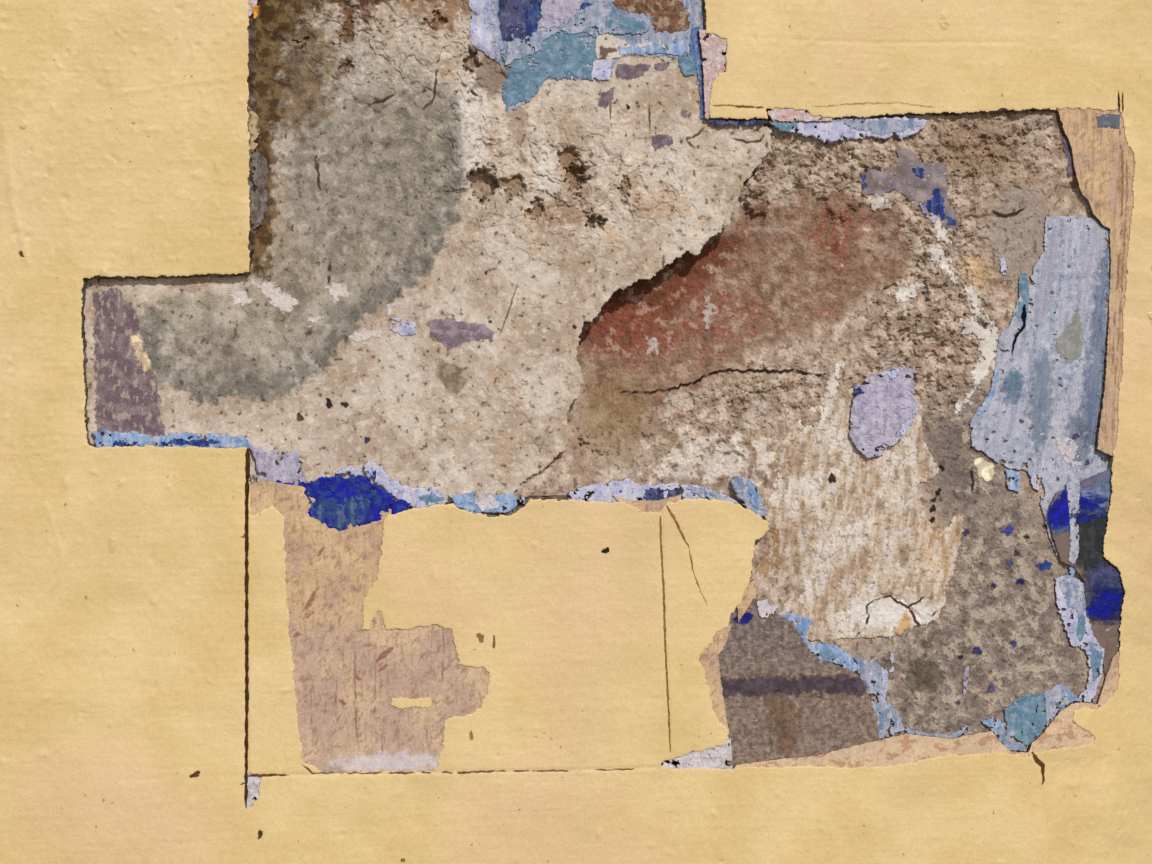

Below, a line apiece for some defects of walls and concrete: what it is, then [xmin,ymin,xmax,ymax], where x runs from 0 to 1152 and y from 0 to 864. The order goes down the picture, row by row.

peeling [1095,114,1121,129]
peeling [390,320,417,336]
peeling [130,333,152,372]
crack [621,368,827,393]
spalling [751,536,774,569]
crack [660,505,706,751]
crack [858,595,936,634]
peeling [699,561,862,731]
crack [1032,751,1045,785]